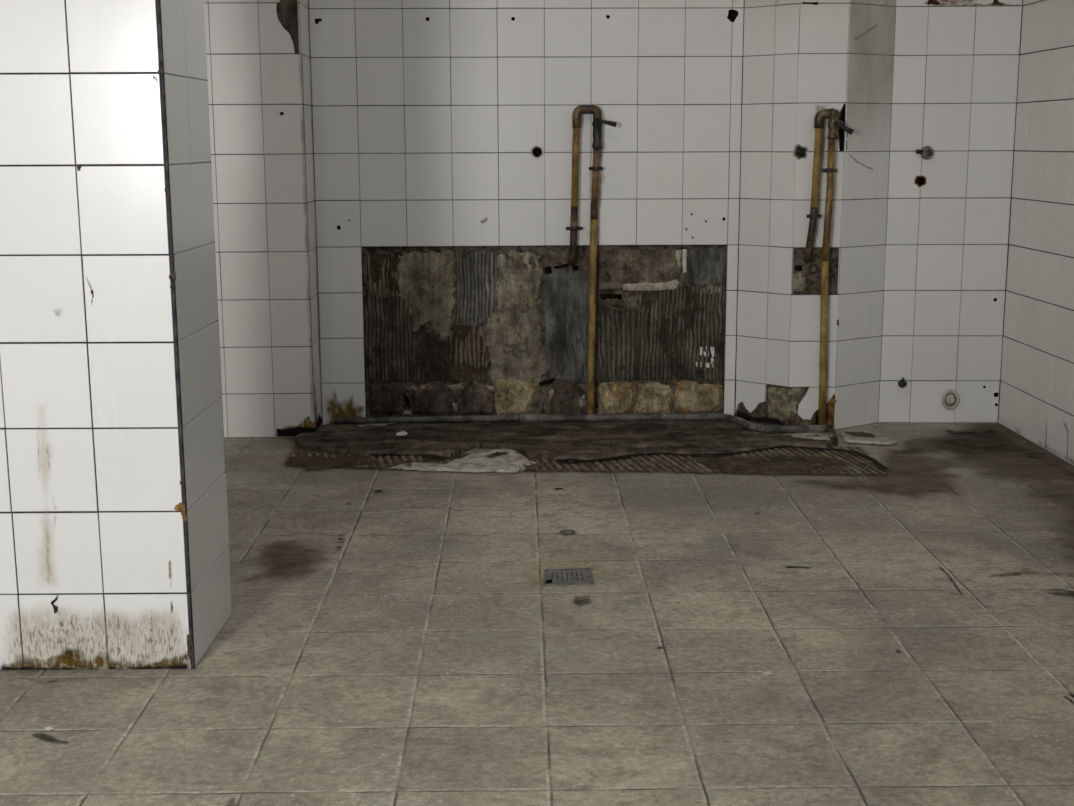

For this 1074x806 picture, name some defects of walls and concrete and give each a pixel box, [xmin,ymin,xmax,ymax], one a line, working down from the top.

spalling [277,0,299,54]
peeling [361,245,839,429]